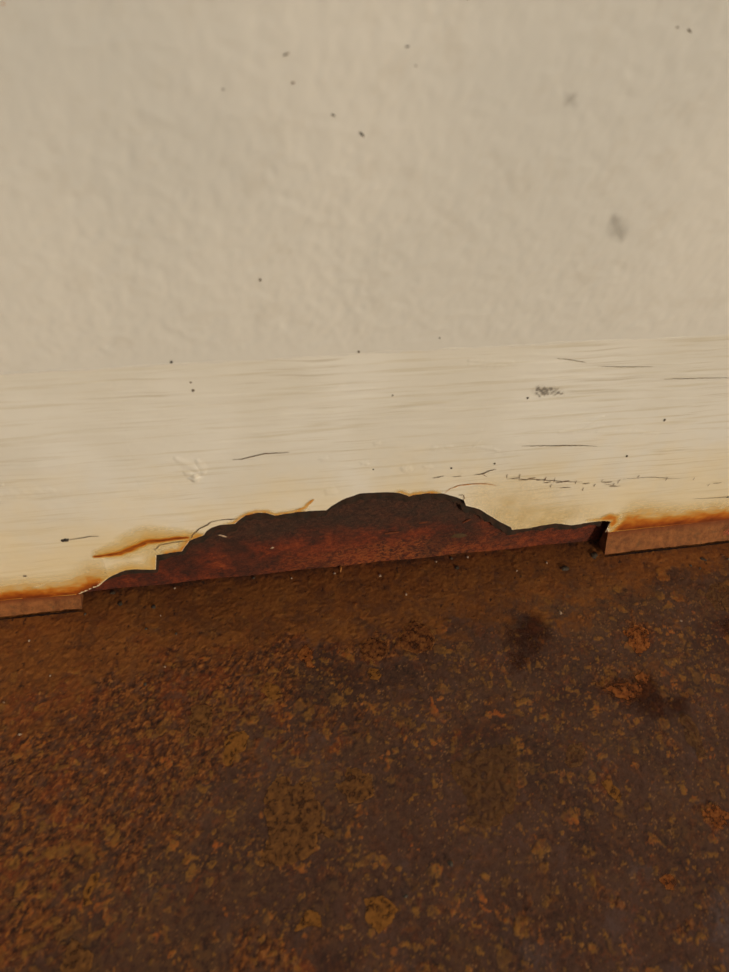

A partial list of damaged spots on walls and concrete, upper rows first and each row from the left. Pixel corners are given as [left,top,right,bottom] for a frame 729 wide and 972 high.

corrosion [229,499,314,524]
spalling [85,492,610,592]
corrosion [0,531,204,601]
corrosion [623,624,650,656]
corrosion [606,672,649,701]
corrosion [364,895,399,934]